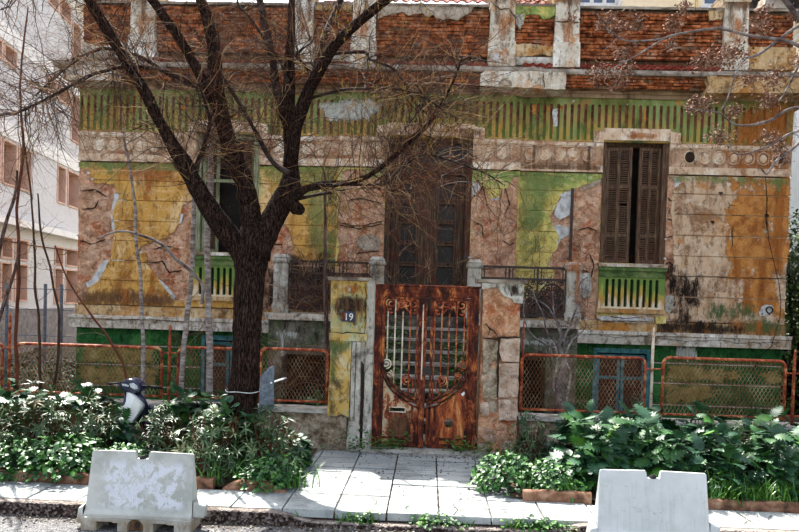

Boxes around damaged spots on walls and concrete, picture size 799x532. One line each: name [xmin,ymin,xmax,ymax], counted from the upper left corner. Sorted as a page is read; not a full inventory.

peeling [320,98,381,121]
flaking render [77,167,127,302]
flaking render [140,200,193,302]
flaking render [468,176,519,287]
flaking render [521,178,654,324]
leakage [657,264,743,334]